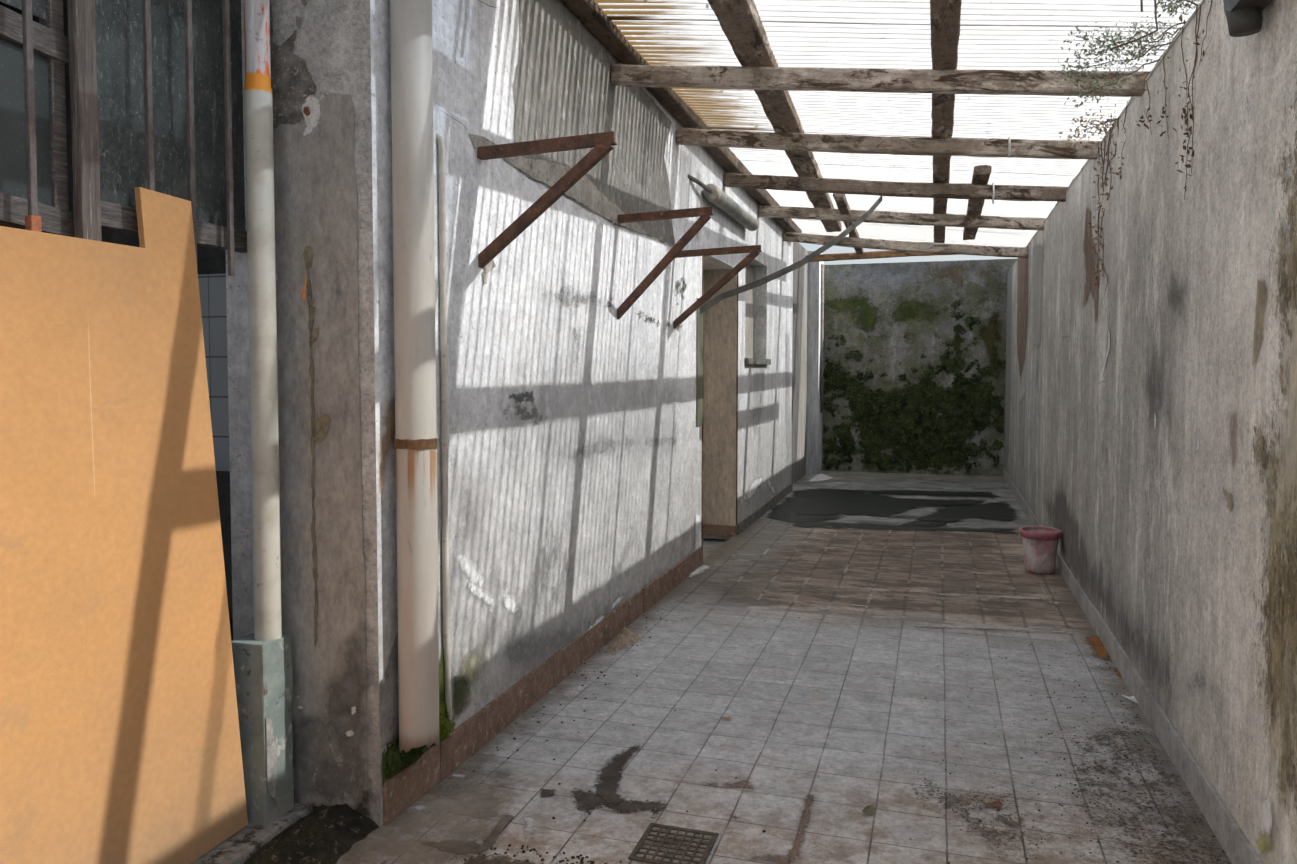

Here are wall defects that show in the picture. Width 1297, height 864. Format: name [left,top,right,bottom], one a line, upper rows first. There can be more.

flaking render [270,0,316,130]
flaking render [469,0,675,246]
corrosion [381,399,395,488]
water stain [503,391,547,425]
water stain [1262,800,1273,835]